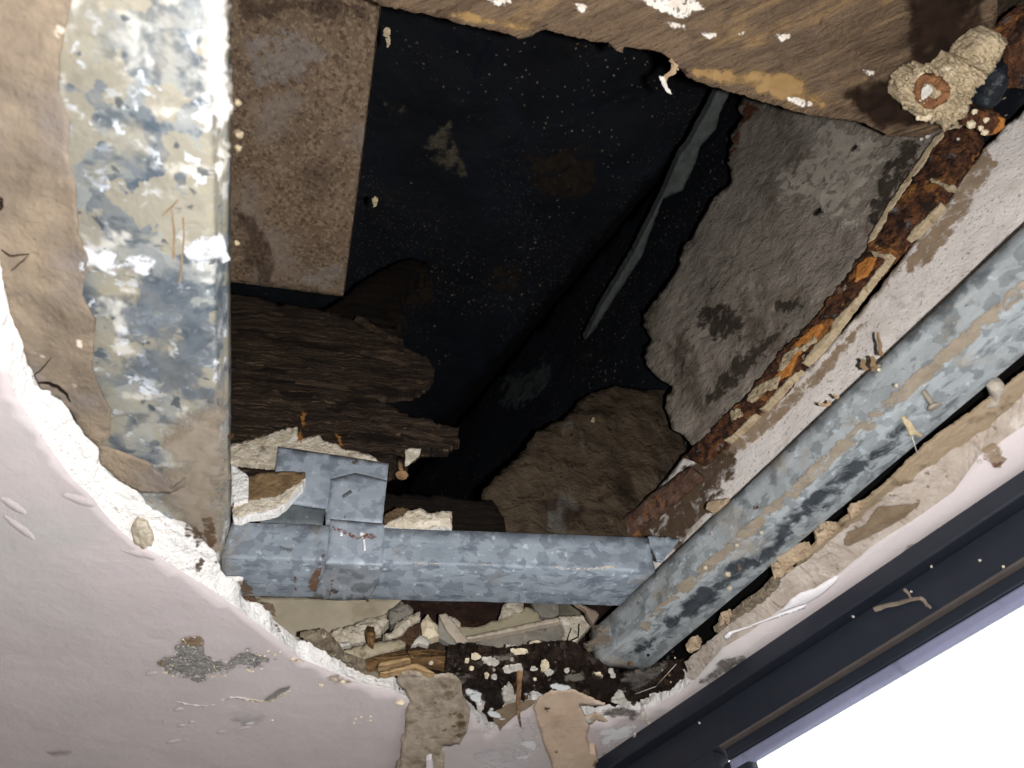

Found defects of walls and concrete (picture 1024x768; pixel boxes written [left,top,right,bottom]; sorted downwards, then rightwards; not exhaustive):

peeling [692,68,826,108]
corrosion [913,73,951,109]
corrosion [957,103,1005,136]
peeling [730,336,817,422]
spalling [0,267,393,690]
peeling [405,448,421,466]
water stain [630,280,1024,653]
spalling [683,393,1024,681]
peeling [411,635,431,649]
peeling [476,660,554,731]
peeling [592,668,655,738]